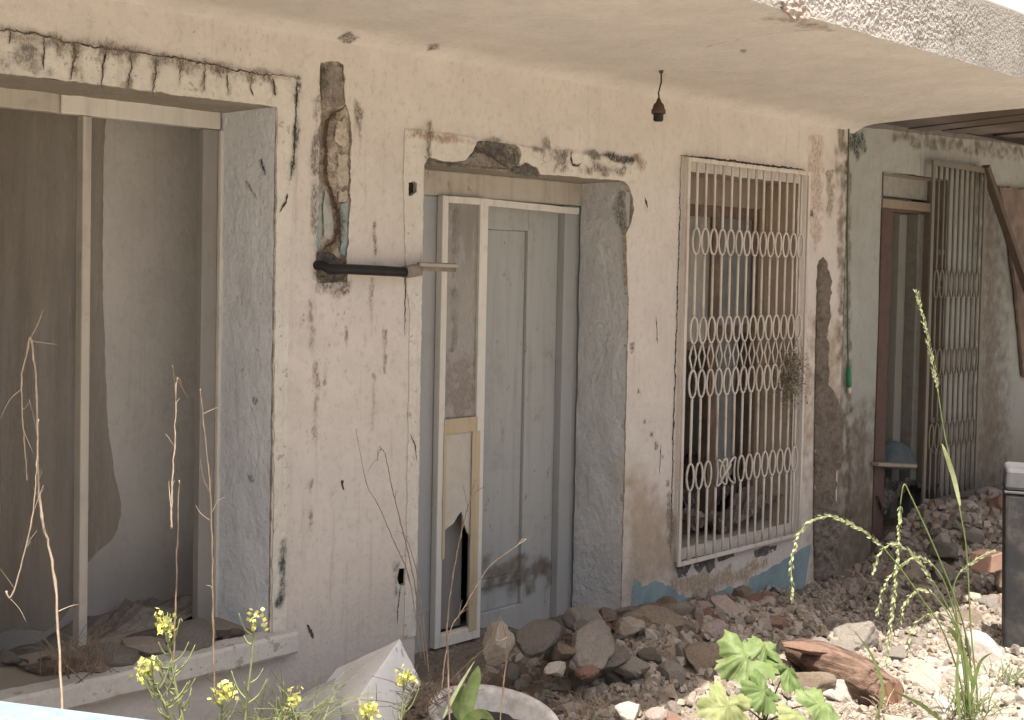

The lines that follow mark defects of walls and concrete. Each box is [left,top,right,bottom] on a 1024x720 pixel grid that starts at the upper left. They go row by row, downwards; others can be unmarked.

flaking render [315,62,350,283]
spalling [476,142,540,176]
damp [826,169,851,355]
peeling [631,544,811,606]